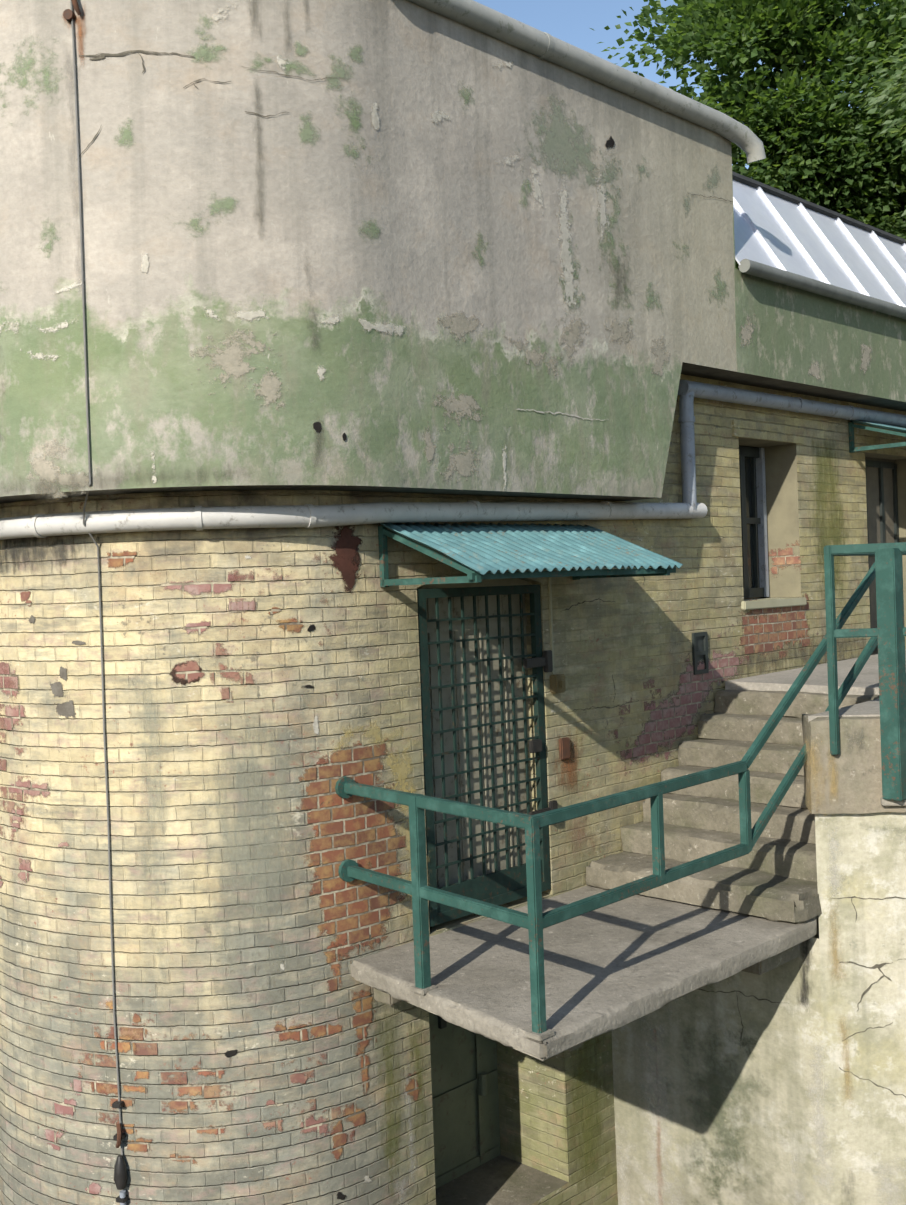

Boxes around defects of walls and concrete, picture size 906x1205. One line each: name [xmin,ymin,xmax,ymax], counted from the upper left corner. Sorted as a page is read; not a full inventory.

crack [79,50,351,88]
flaking render [158,555,331,645]
spalling [315,525,365,602]
flaking render [0,662,50,843]
spalling [170,643,255,703]
flaking render [608,594,823,773]
flaking render [296,738,406,992]
crack [832,896,906,922]
flaking render [44,1001,237,1152]
flaking render [275,990,377,1160]
leakage [696,1066,752,1158]
crack [839,959,906,1097]